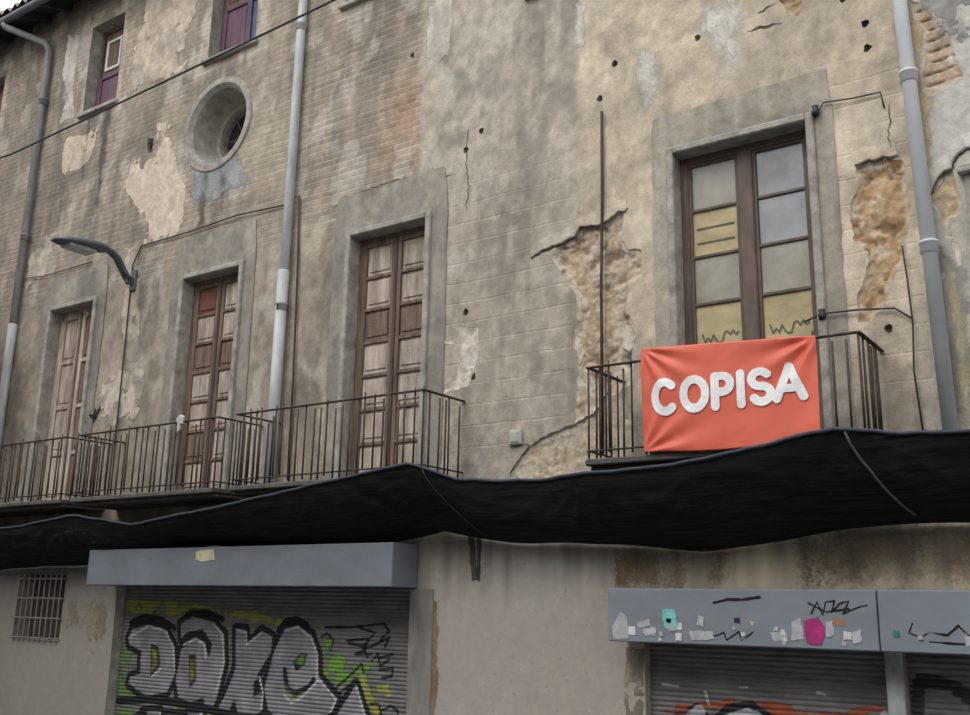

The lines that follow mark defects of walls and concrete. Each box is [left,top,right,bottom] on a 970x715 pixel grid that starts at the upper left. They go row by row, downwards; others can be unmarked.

flaking render [60,32,80,124]
spalling [751,0,806,31]
flaking render [909,1,965,97]
flaking render [61,128,99,176]
water stain [199,172,208,224]
crack [432,129,470,209]
crack [851,102,900,168]
crack [928,132,970,195]
flaking render [97,121,186,428]
flaking render [850,159,911,324]
flaking render [514,213,642,479]